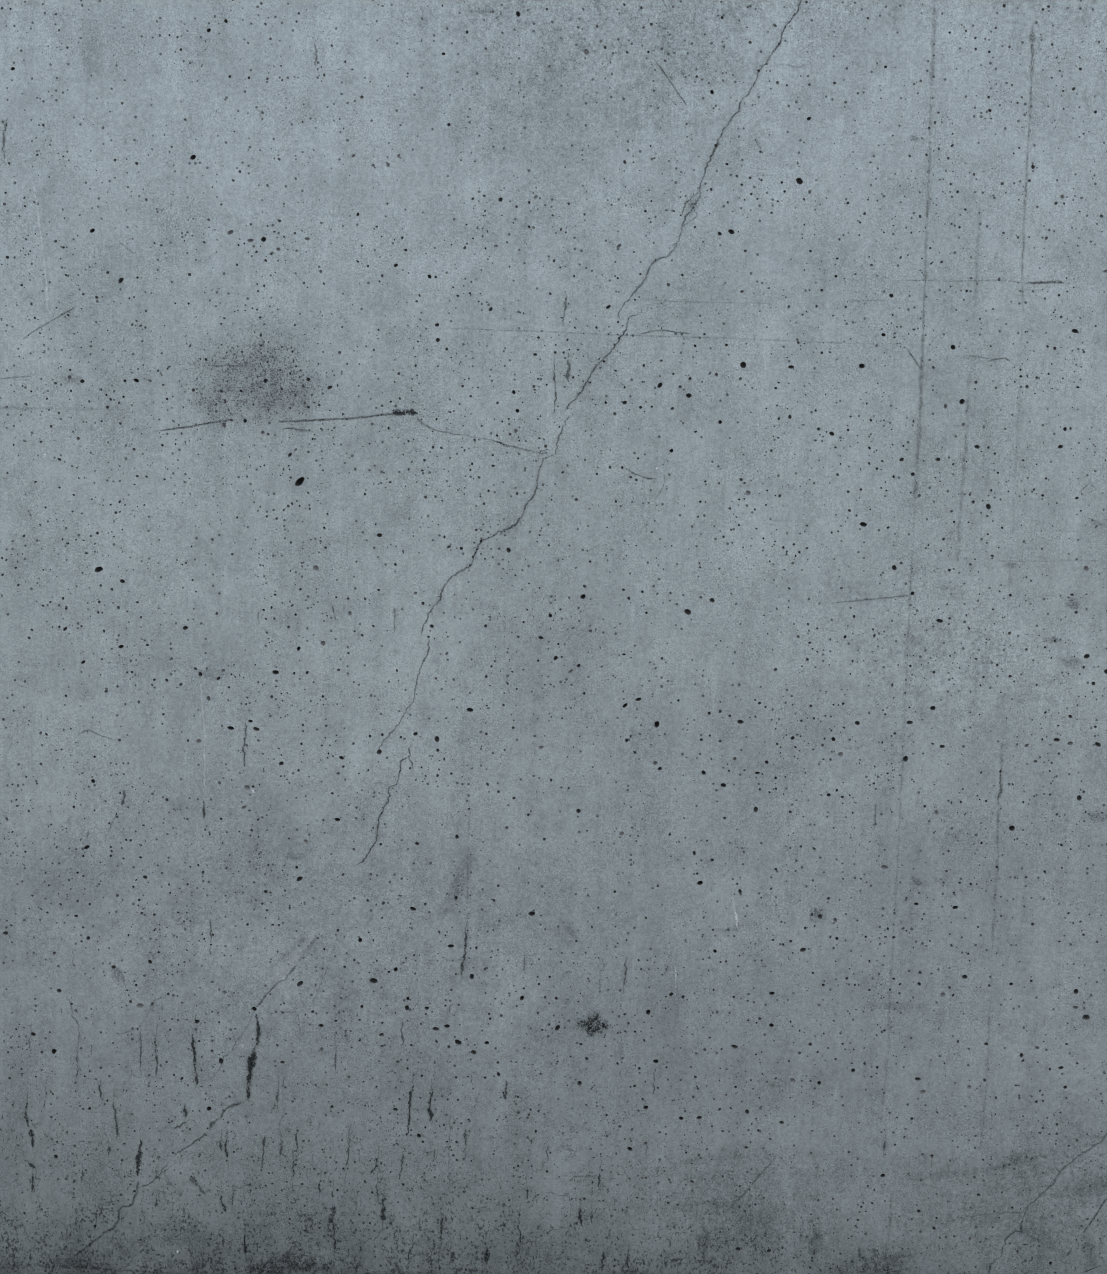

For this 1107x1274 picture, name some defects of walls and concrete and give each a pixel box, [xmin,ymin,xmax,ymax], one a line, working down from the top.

crack [281,409,447,433]